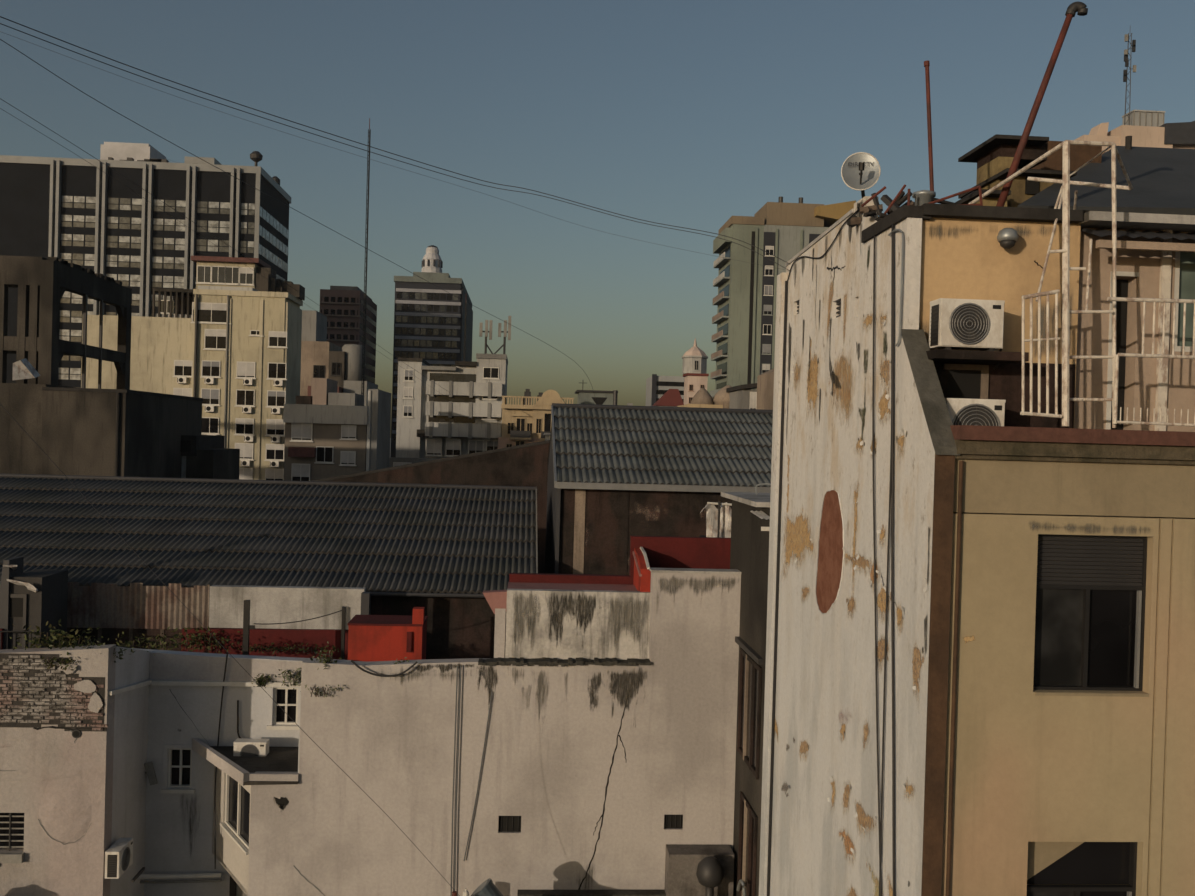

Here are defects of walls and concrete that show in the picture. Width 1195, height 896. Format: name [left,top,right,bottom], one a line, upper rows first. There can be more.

peeling [807,345,819,416]
flaking render [784,455,904,630]
water stain [514,593,645,646]
peeling [912,616,927,692]
flaking render [0,653,108,732]
water stain [537,672,548,714]
water stain [590,669,644,716]
peeling [828,777,877,857]